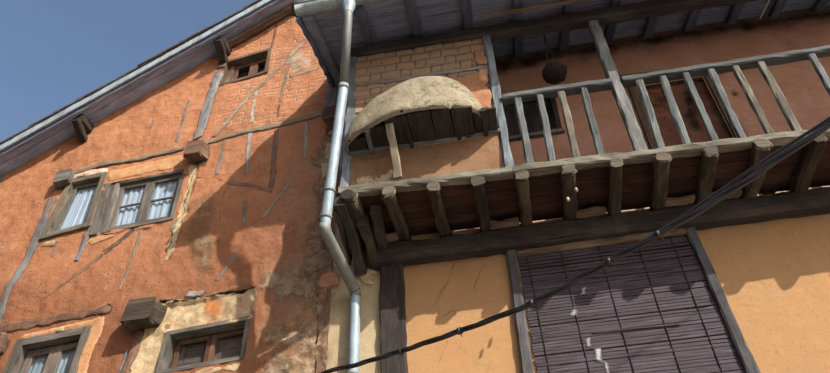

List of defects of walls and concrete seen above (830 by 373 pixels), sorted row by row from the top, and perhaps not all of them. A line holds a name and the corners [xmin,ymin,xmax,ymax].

peeling [450,52,493,108]
peeling [74,155,213,272]
crack [159,283,256,305]
peeling [130,135,332,373]